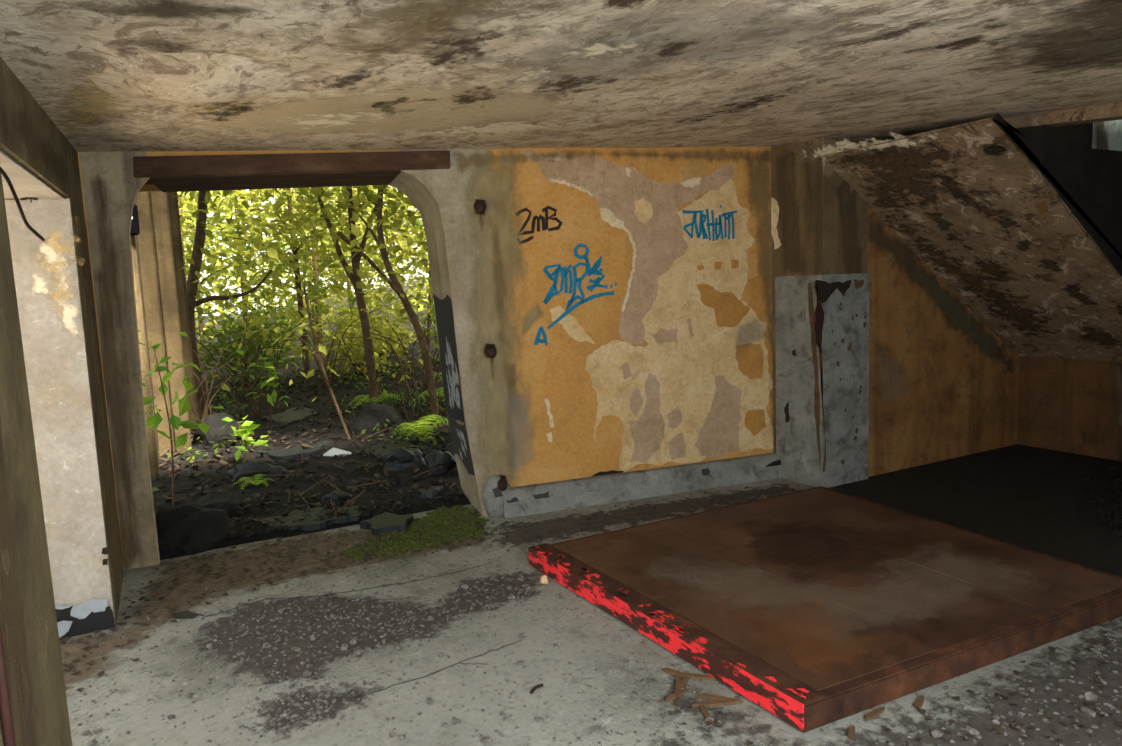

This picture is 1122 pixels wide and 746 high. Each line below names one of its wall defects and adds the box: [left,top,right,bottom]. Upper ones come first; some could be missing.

water stain [79,1,245,18]
water stain [152,41,192,53]
water stain [349,0,499,61]
water stain [994,0,1122,73]
water stain [839,180,1011,370]
peeling [519,150,790,477]
peeling [55,599,115,638]